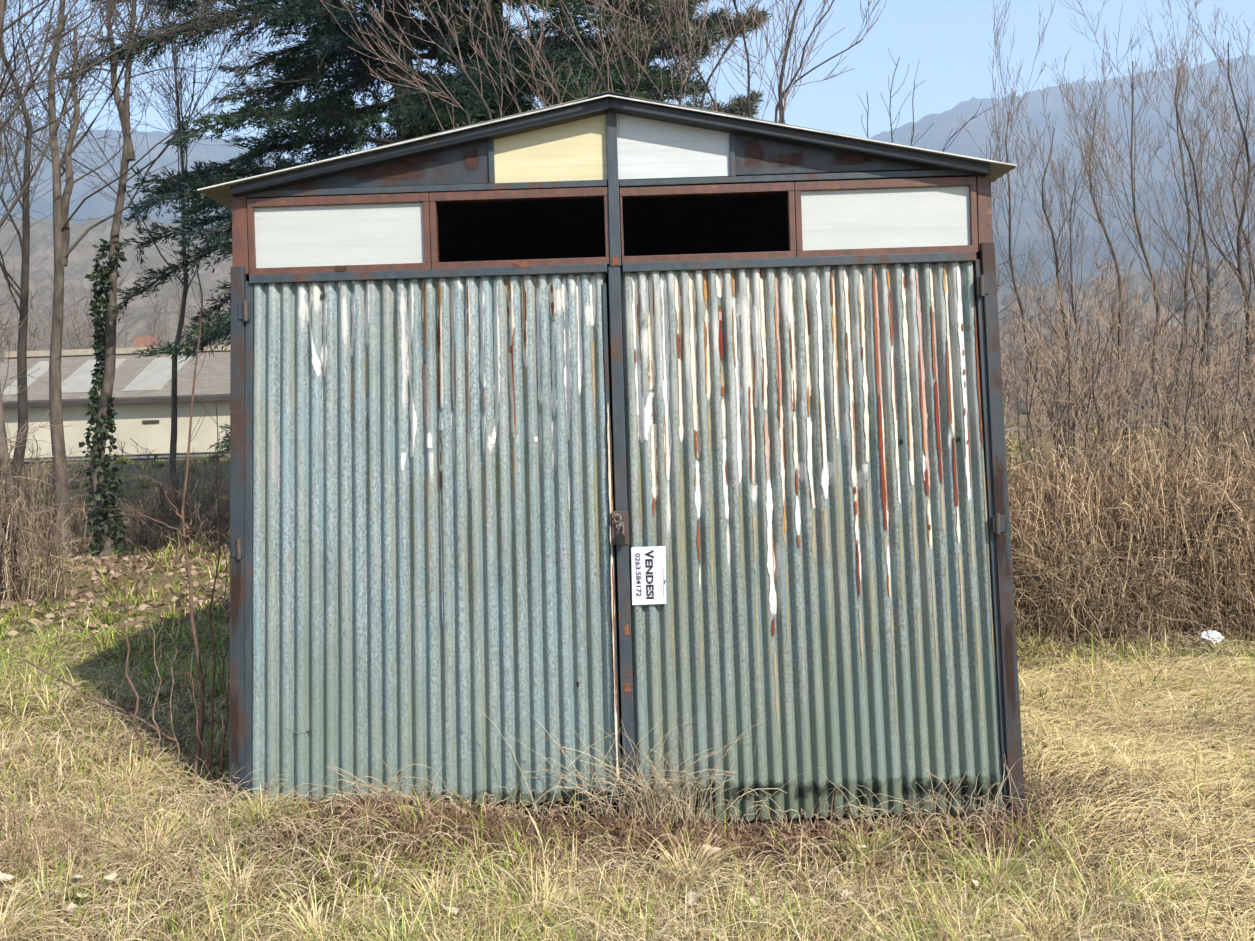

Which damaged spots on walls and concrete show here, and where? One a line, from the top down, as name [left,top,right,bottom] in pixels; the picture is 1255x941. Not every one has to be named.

corrosion [357,153,437,180]
corrosion [744,140,802,167]
peeling [298,281,370,504]
peeling [394,278,518,721]
corrosion [514,261,530,406]
peeling [632,269,874,695]
corrosion [873,266,904,603]
peeling [901,265,932,565]
peeling [917,567,937,690]